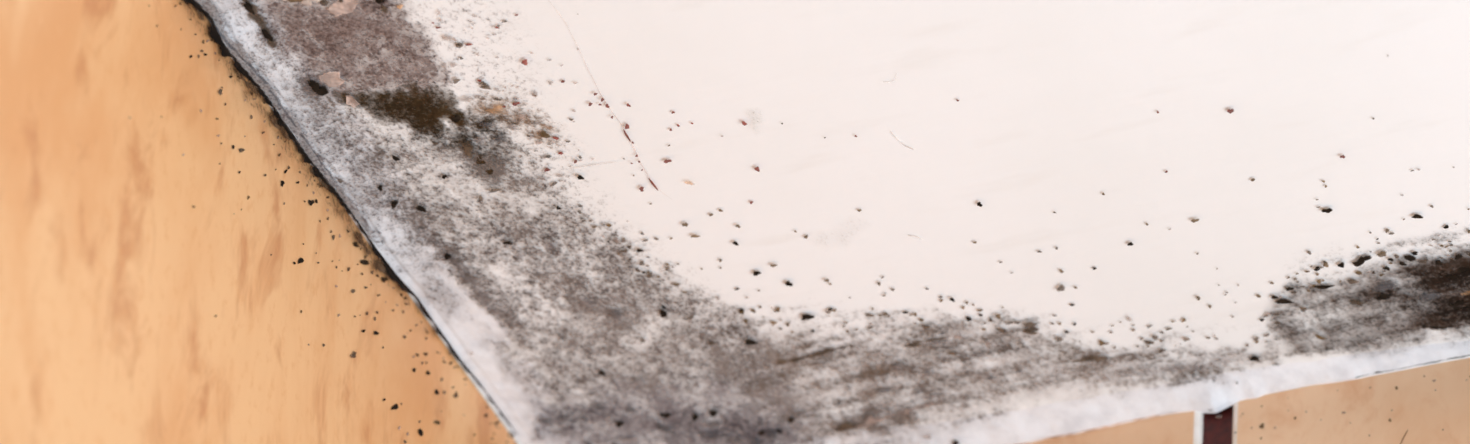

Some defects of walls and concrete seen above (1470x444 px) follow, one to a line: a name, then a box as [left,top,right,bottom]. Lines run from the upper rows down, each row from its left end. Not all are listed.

water stain [1253,232,1470,356]